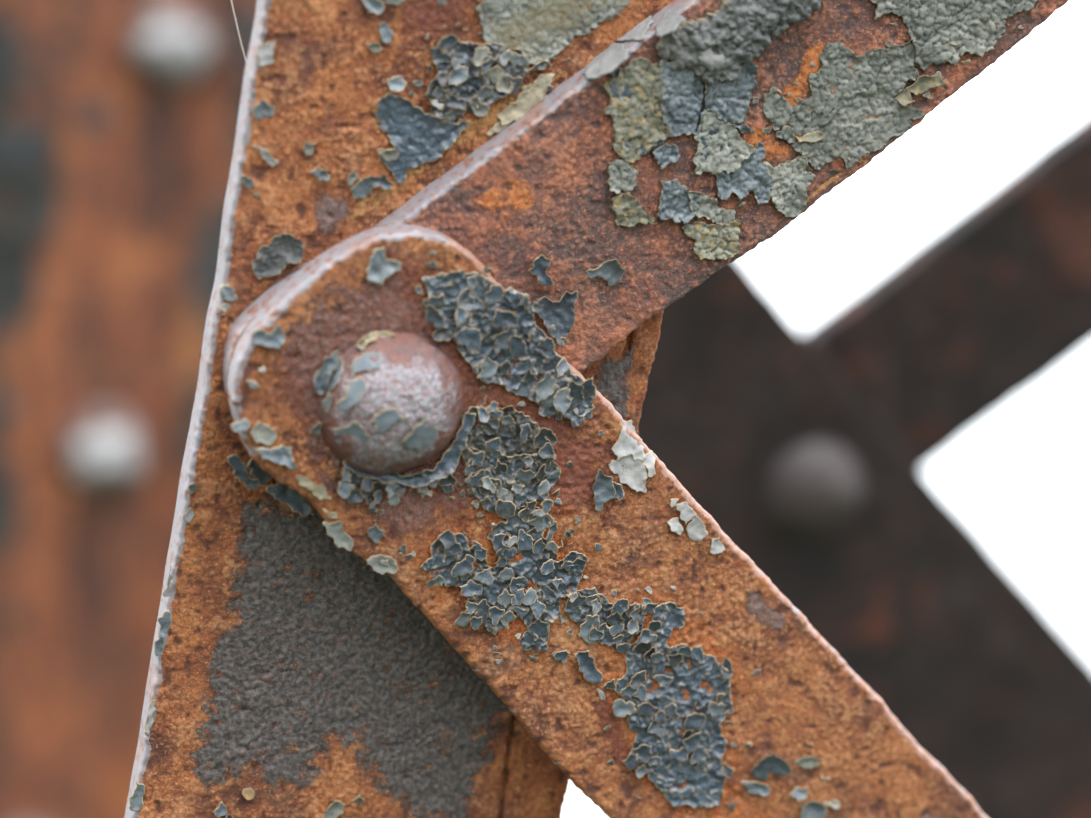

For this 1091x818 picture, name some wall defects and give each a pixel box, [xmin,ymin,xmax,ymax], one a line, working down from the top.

peeling [230,0,276,112]
peeling [362,0,406,53]
rust [784,43,826,106]
peeling [345,23,574,199]
rust [443,91,523,154]
peeling [582,0,826,261]
rust [748,127,788,161]
rust [477,179,535,212]
rust [265,252,623,570]
peeling [227,247,831,810]
rust [496,612,543,659]
peeling [788,786,840,818]